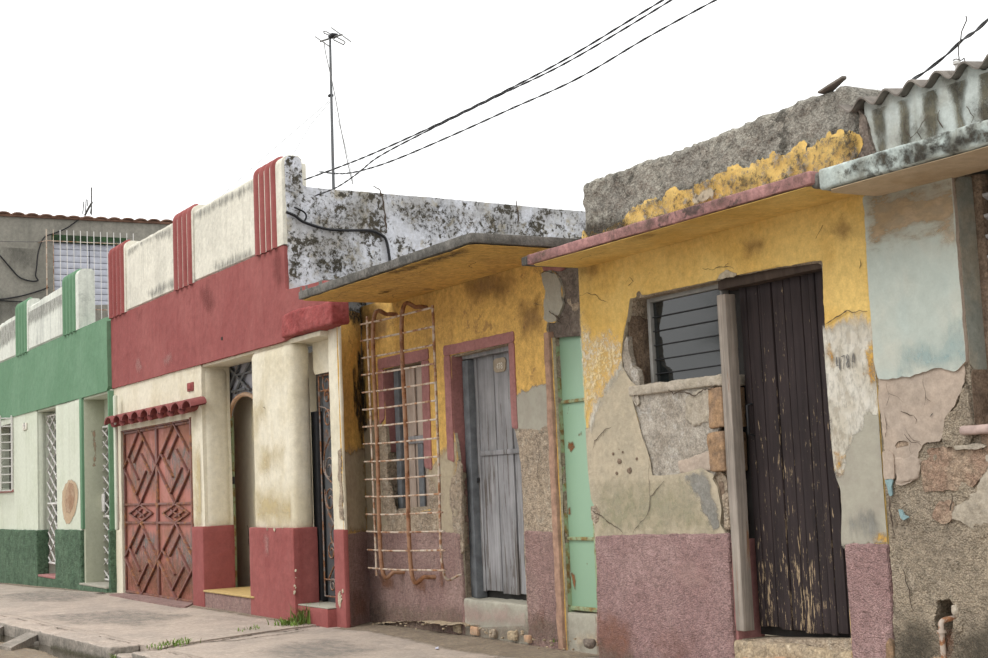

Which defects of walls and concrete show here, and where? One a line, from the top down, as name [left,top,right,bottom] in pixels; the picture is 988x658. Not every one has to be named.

damp [286,176,377,278]
damp [397,203,468,235]
damp [481,212,540,236]
peeling [581,129,863,239]
damp [851,106,889,170]
damp [898,72,988,164]
spalling [541,267,581,338]
spalling [514,384,553,539]
peeling [585,336,731,544]
peeling [823,315,909,547]
spalling [921,385,988,524]